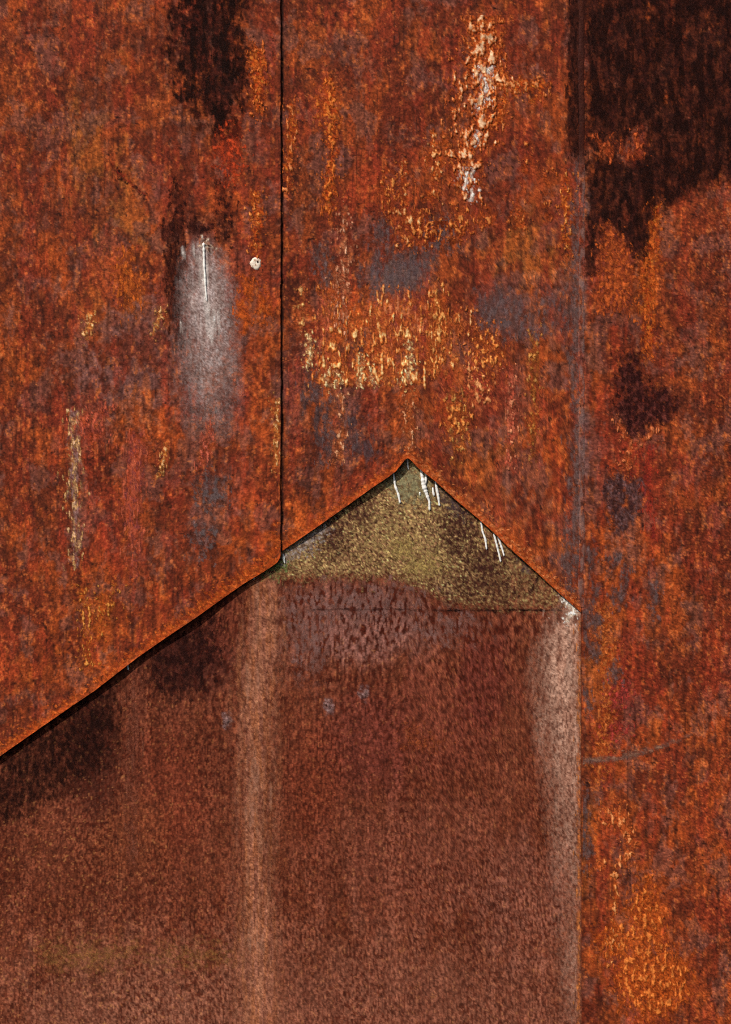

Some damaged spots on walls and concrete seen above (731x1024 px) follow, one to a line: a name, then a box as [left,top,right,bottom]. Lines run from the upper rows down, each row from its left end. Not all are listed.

water stain [162,0,255,145]
corrosion [210,37,273,259]
corrosion [377,15,551,252]
water stain [563,0,731,276]
corrosion [110,239,168,341]
water stain [161,179,239,379]
corrosion [66,396,116,452]
water stain [608,351,679,439]
corrosion [119,77,698,1021]
corrosion [0,575,127,753]